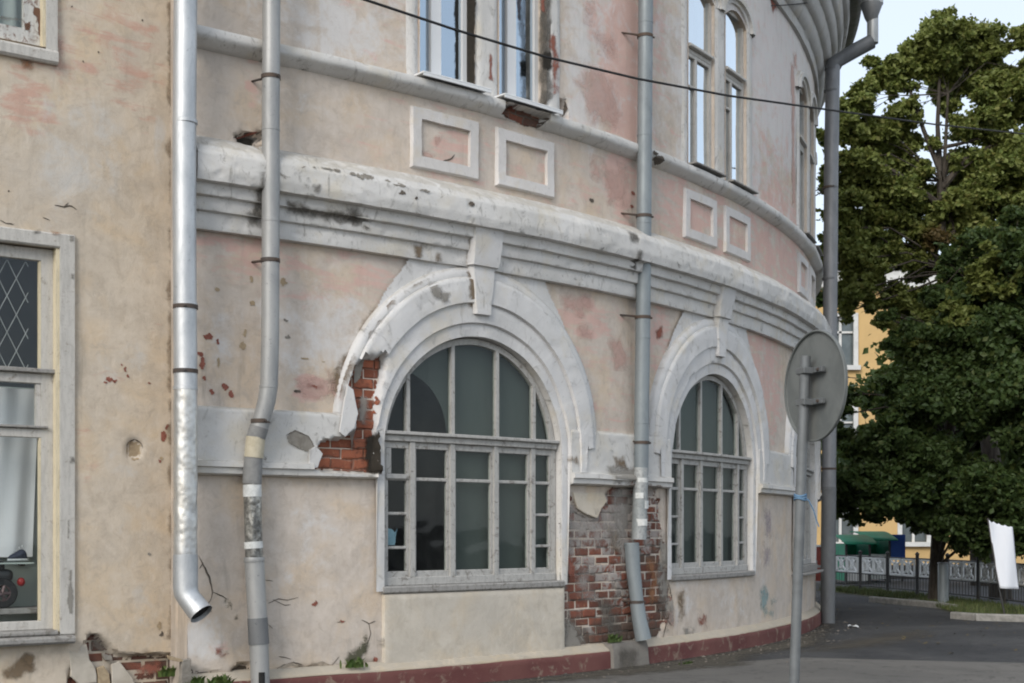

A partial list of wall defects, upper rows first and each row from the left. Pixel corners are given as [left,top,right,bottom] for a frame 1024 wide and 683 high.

hole [234,131,262,146]
spalling [502,102,549,129]
leakage [287,201,369,229]
peeling [197,352,234,398]
flaking render [287,357,383,474]
flaking render [127,439,143,461]
crack [198,555,226,612]
flaking render [559,480,683,647]
flaking render [68,635,170,683]